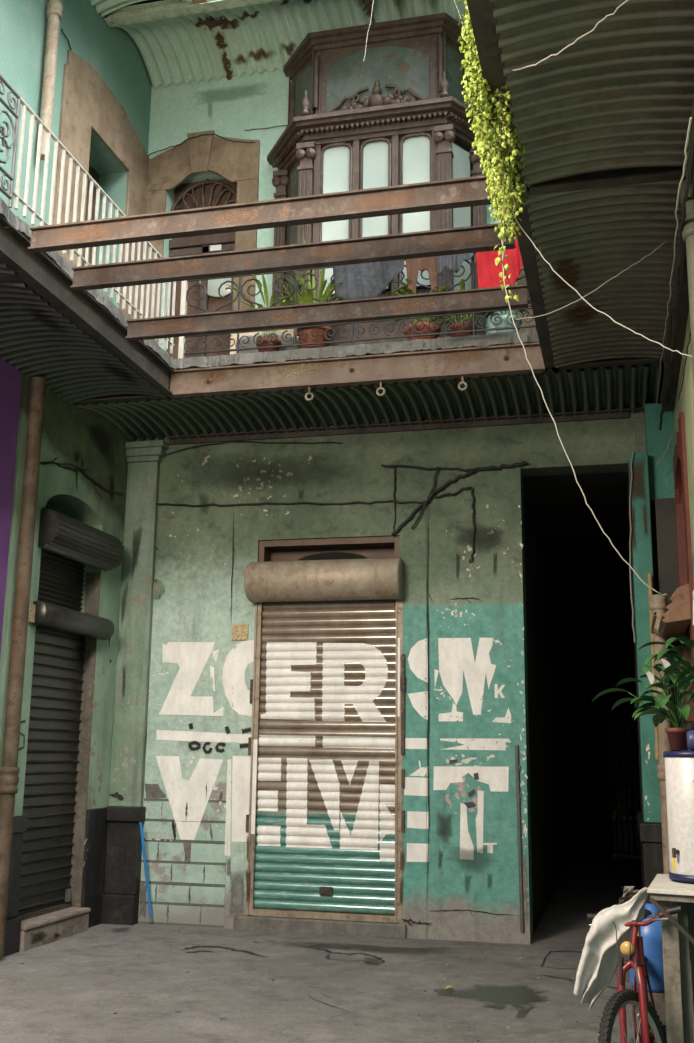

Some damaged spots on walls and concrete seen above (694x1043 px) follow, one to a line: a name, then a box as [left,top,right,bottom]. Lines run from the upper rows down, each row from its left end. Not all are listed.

rust [195,11,269,80]
peeling [233,457,293,515]
peeling [89,725,136,807]
spalling [138,782,227,928]
damp [435,985,544,1018]